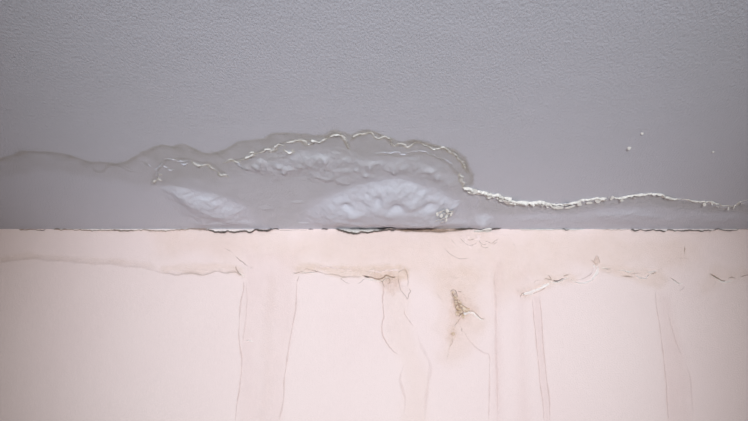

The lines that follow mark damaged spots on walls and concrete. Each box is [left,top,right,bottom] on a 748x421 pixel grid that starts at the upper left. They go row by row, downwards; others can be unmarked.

peeling [223,132,747,210]
crack [20,226,278,234]
crack [309,227,414,235]
crack [617,226,737,234]
crack [298,265,404,282]